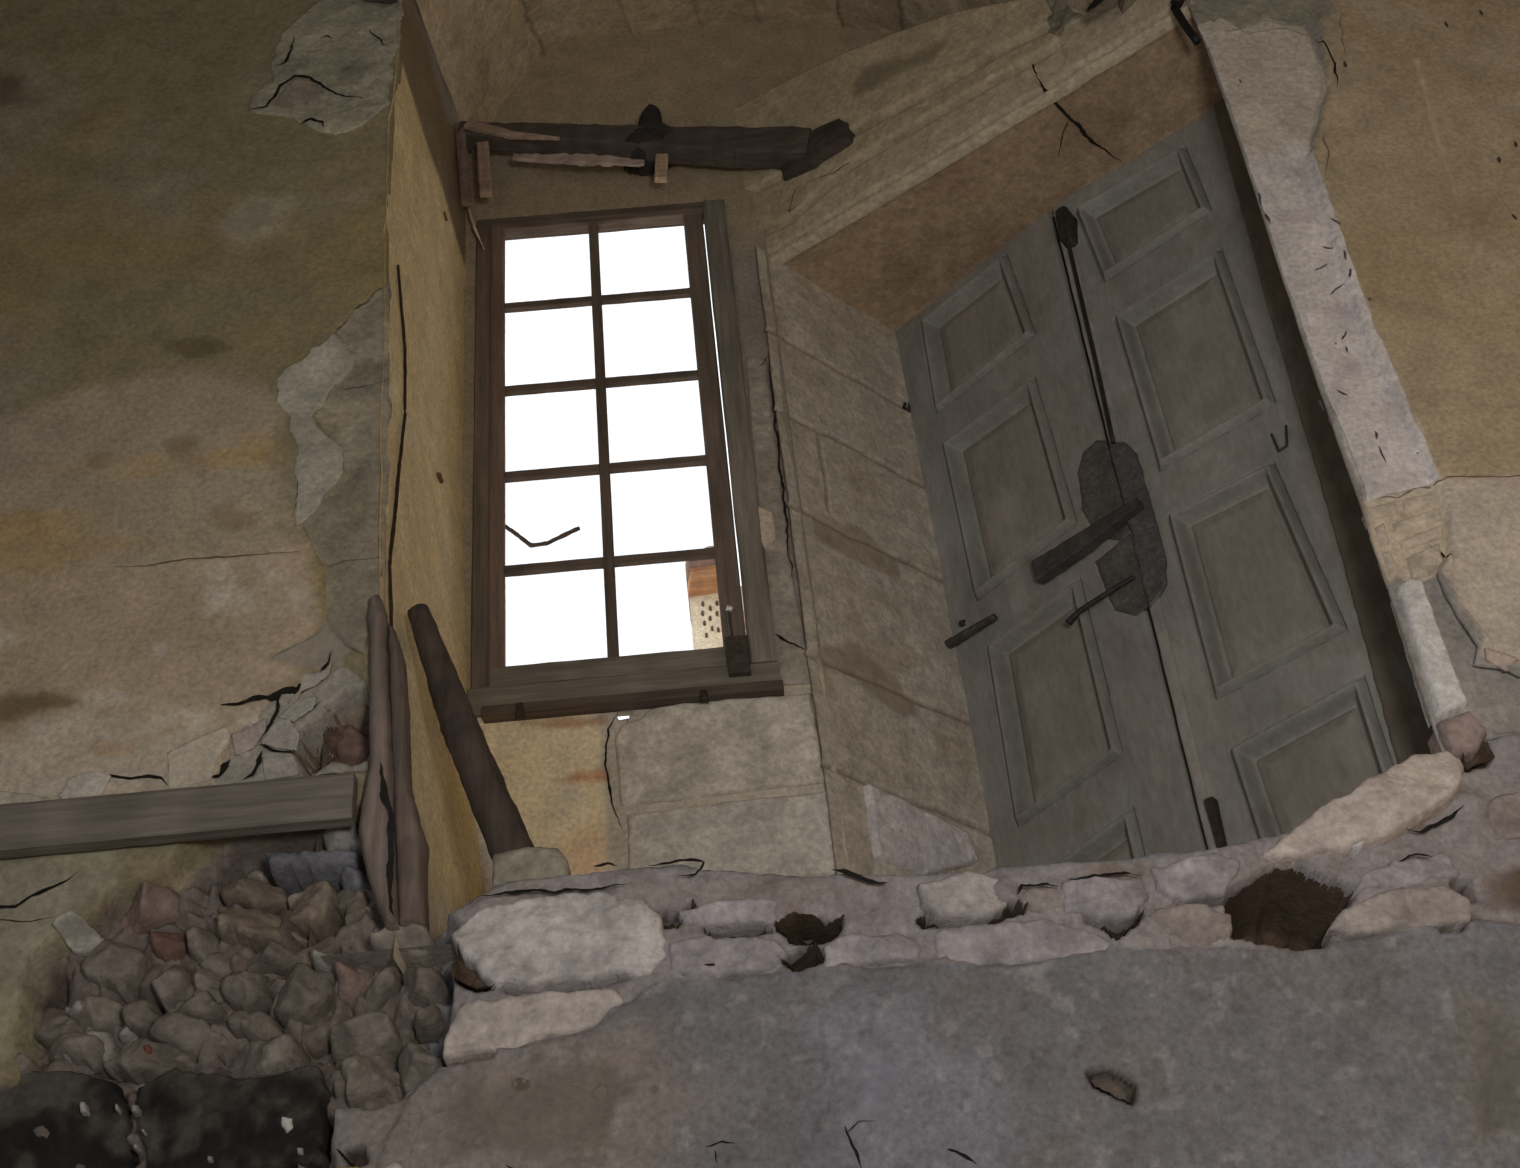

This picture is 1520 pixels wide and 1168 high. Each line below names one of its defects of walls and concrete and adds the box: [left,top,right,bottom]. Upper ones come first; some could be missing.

flaking render [250,0,404,135]
crack [1032,64,1121,161]
spalling [0,282,392,804]
flaking render [1390,554,1520,730]
spalling [1462,741,1495,772]
crack [0,871,78,922]